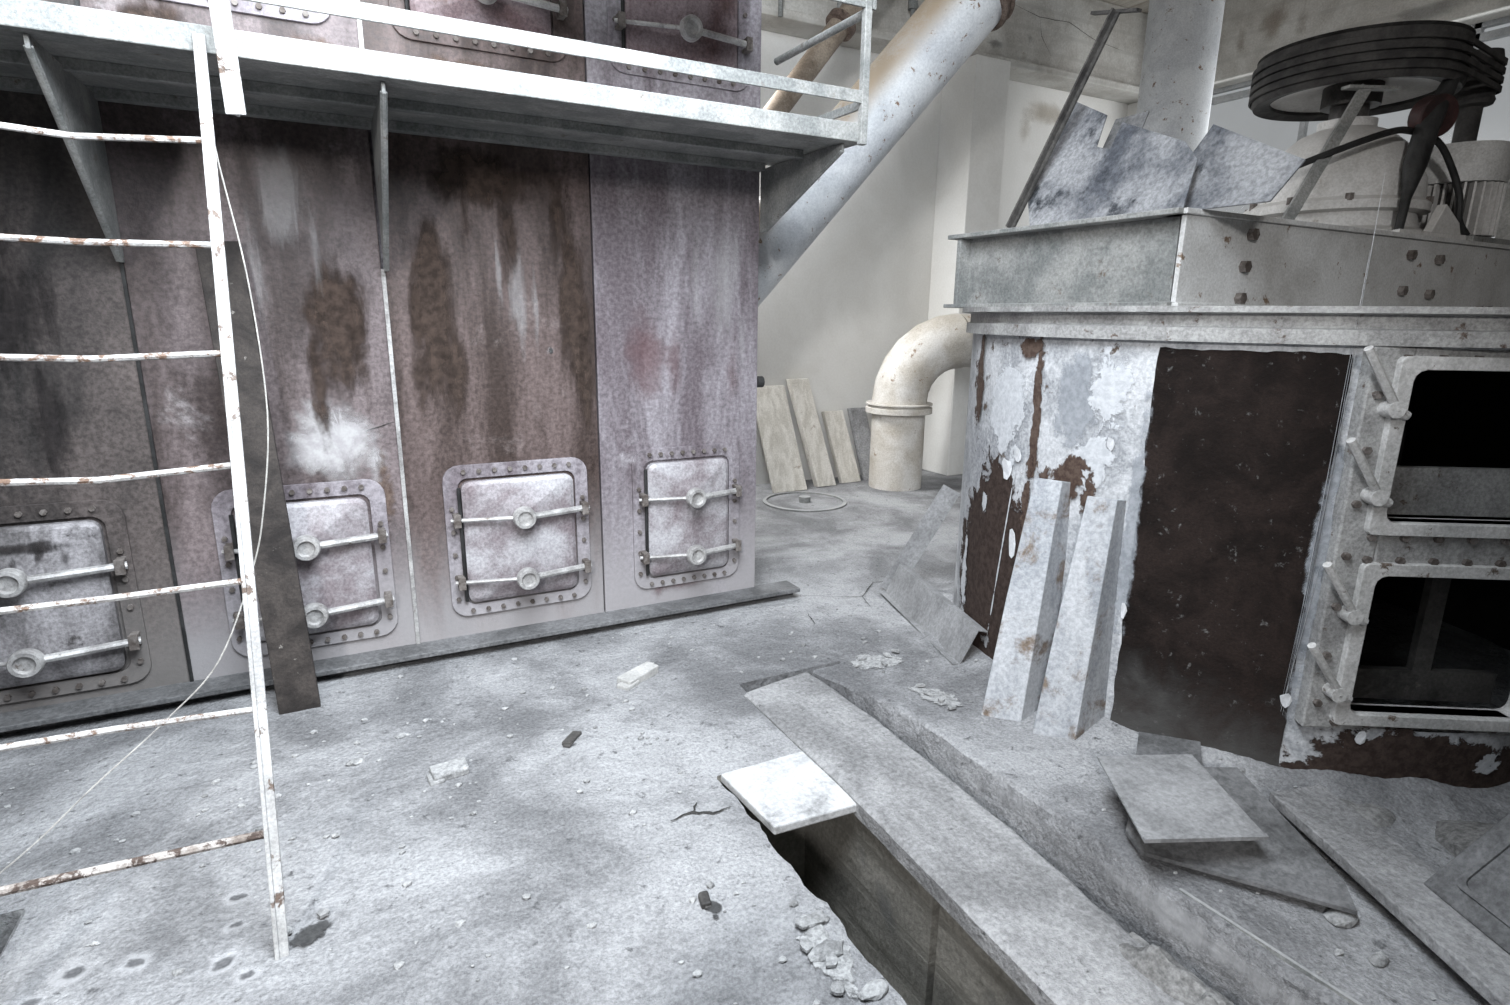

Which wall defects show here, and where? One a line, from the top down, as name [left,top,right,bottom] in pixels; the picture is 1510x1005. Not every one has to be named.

damp [298,409,380,471]
peeling [959,362,1028,659]
peeling [1053,342,1152,634]